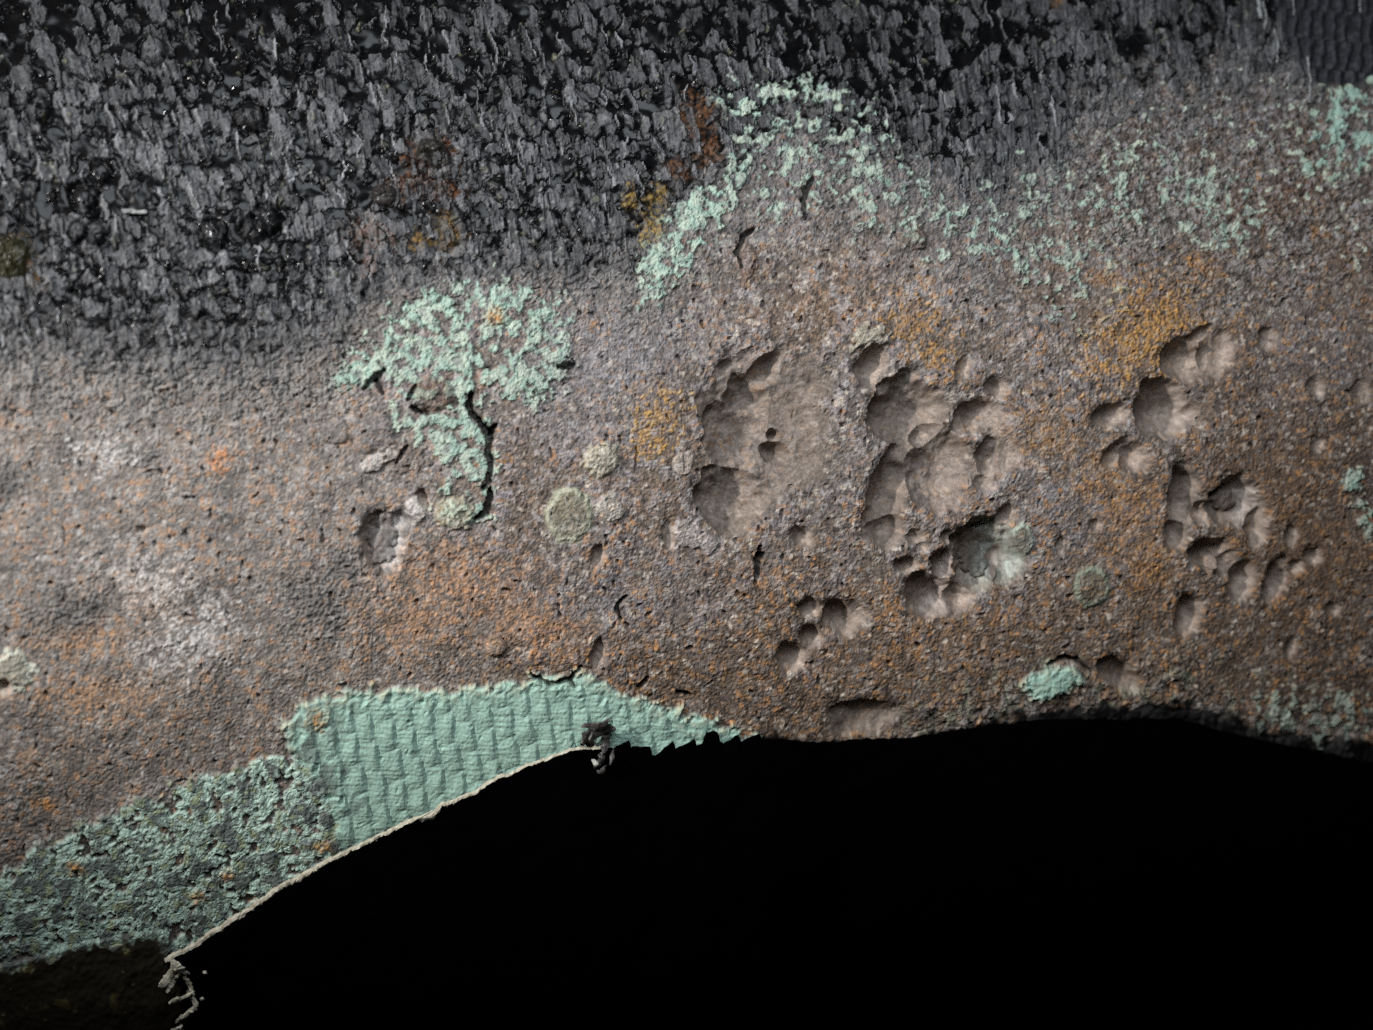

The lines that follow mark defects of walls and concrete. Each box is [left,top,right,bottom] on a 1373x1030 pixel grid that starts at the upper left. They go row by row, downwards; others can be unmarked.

hole [775,595,874,674]
hole [681,332,1031,625]
rust [851,272,998,393]
rust [998,229,1373,661]
hole [1173,592,1206,637]
hole [1089,322,1328,609]